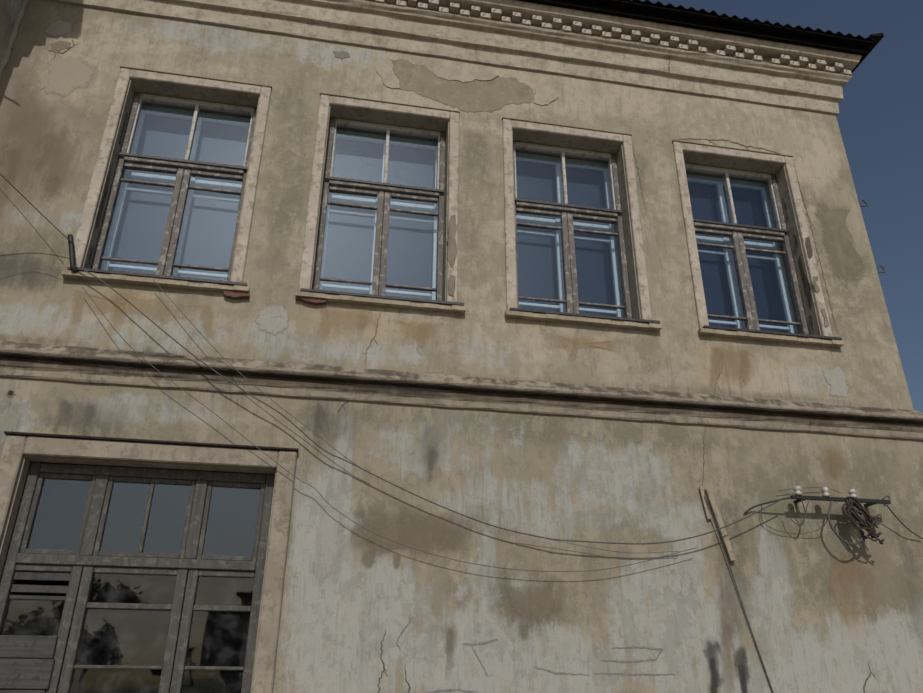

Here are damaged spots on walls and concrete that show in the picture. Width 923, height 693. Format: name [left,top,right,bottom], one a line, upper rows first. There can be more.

peeling [376,57,559,113]
flaking render [296,296,327,305]
water stain [329,438,353,497]
crack [378,631,411,693]